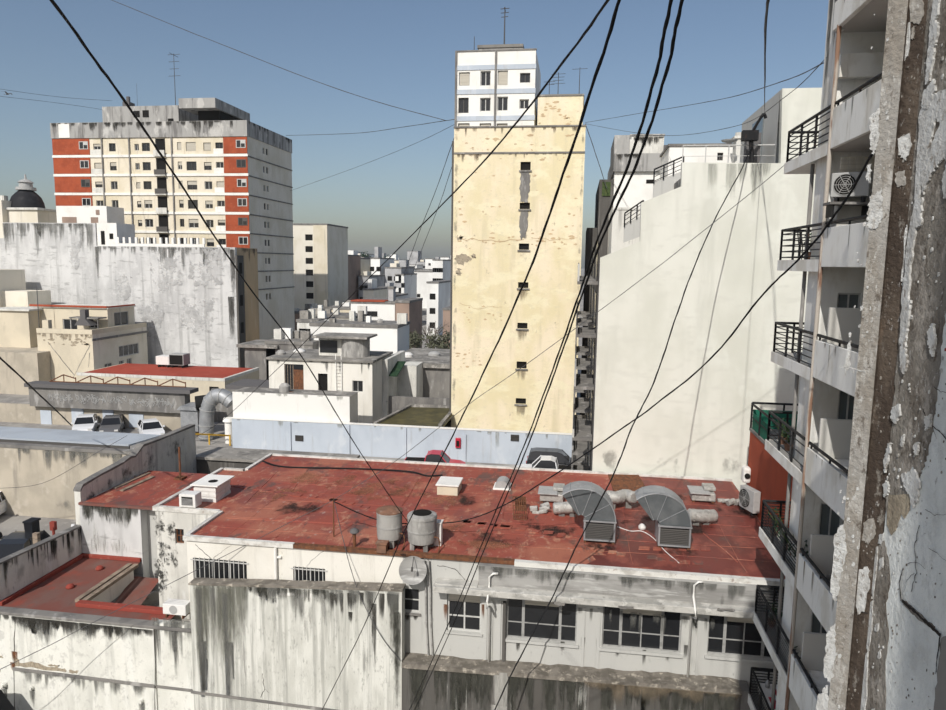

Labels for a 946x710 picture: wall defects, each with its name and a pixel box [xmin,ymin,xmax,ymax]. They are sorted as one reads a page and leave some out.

water stain [51,121,233,132]
water stain [2,223,257,291]
peeling [830,0,946,710]
mould [153,518,177,592]
crack [899,509,945,674]
water stain [3,585,492,710]
water stain [507,677,584,710]
water stain [601,684,614,710]
water stain [626,686,737,710]
peeling [816,623,841,710]